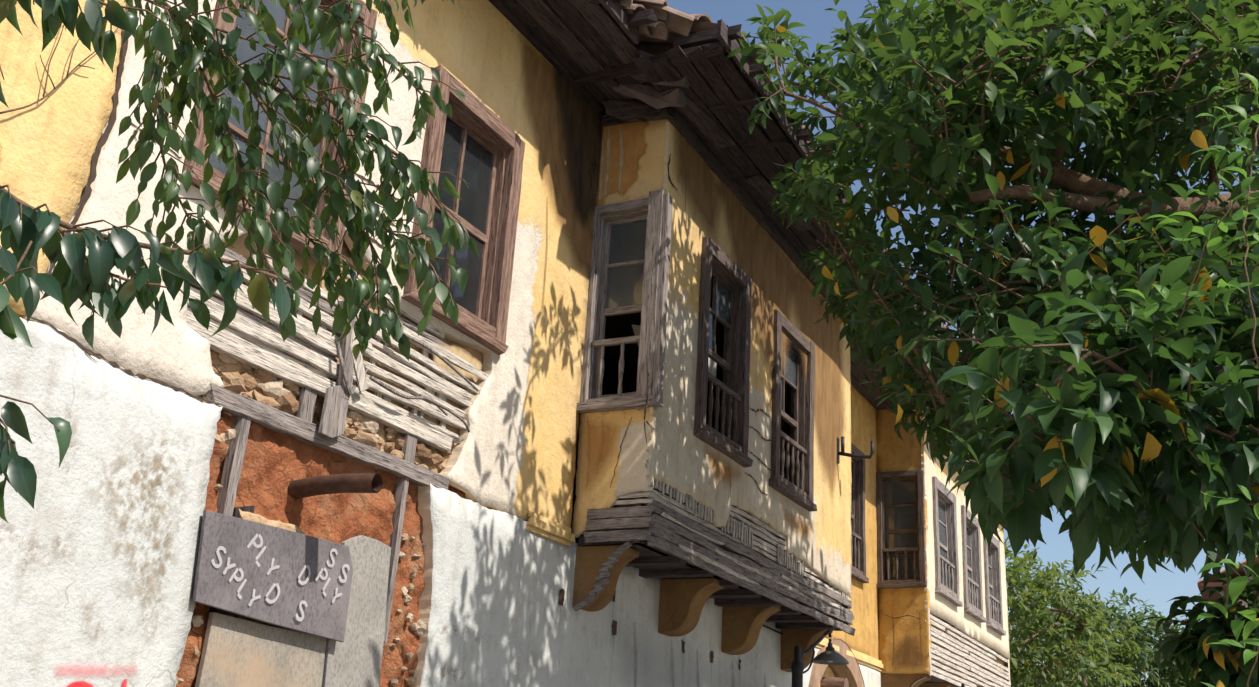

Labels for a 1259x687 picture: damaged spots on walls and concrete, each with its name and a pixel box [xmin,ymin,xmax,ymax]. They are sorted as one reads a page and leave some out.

peeling [596,115,648,206]
flaking render [186,233,489,687]
crack [610,373,652,488]
mould [107,442,174,606]
flaking render [176,602,210,687]